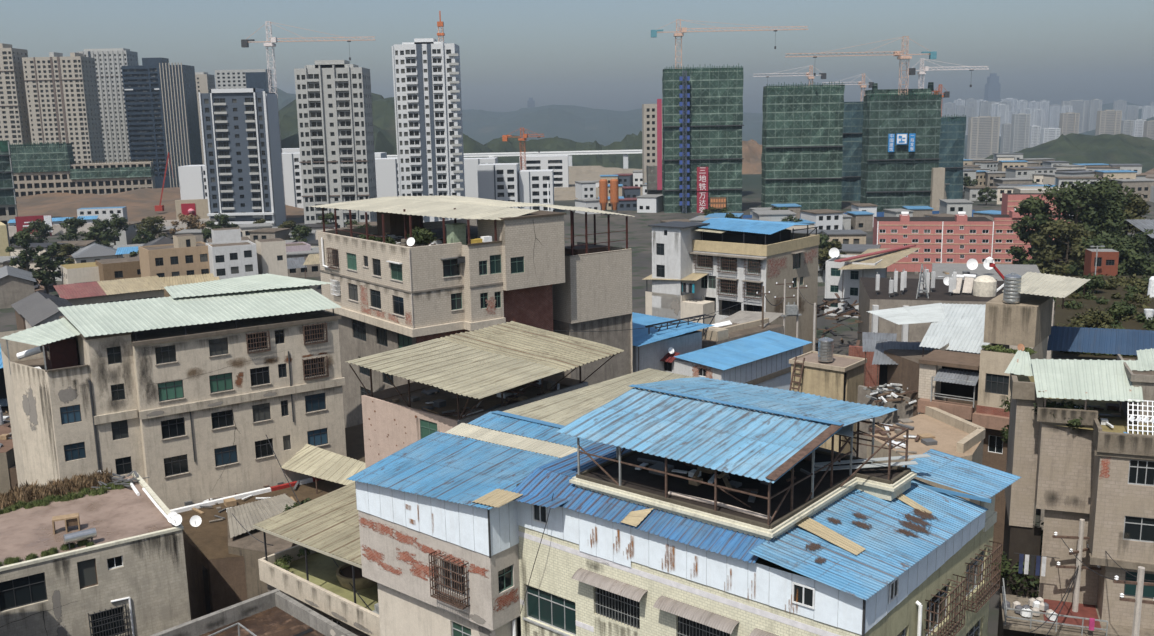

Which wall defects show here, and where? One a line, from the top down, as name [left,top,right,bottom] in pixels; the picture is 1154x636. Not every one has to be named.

peeling [22,388,38,431]
rust [825,513,872,529]
rust [897,509,936,537]
peeling [358,518,488,583]
rust [806,543,826,564]